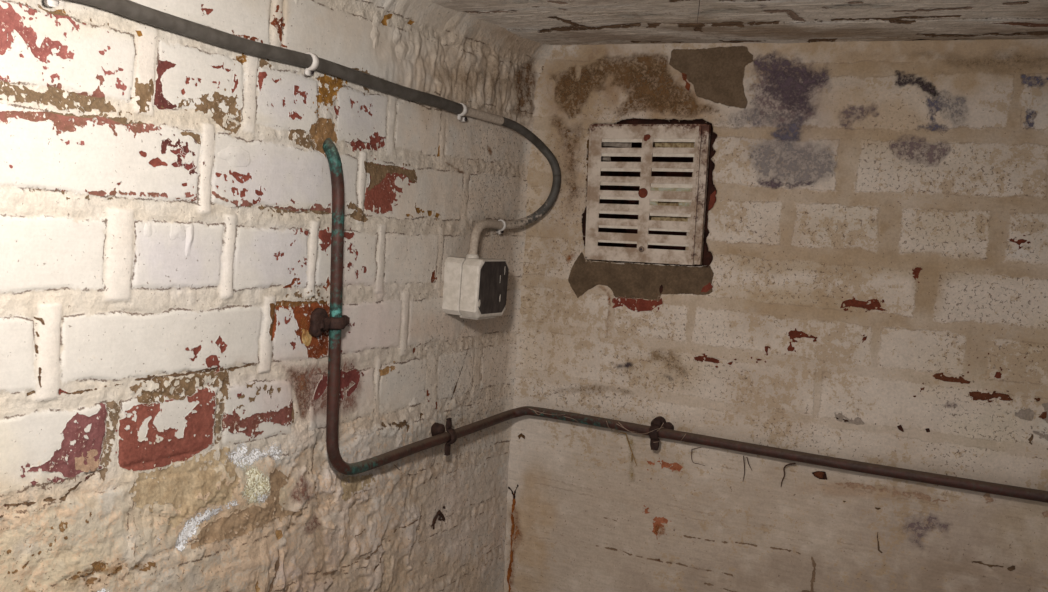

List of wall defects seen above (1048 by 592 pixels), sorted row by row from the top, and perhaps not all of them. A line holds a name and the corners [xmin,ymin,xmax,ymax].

spalling [669,0,1048,43]
peeling [0,0,281,201]
water stain [735,54,833,189]
water stain [890,71,966,164]
peeling [211,169,331,260]
peeling [271,67,441,278]
peeling [612,285,663,312]
peeling [785,328,818,354]
peeling [840,296,891,317]
peeling [21,335,303,550]
peeling [913,353,1048,441]
water stain [175,443,282,552]